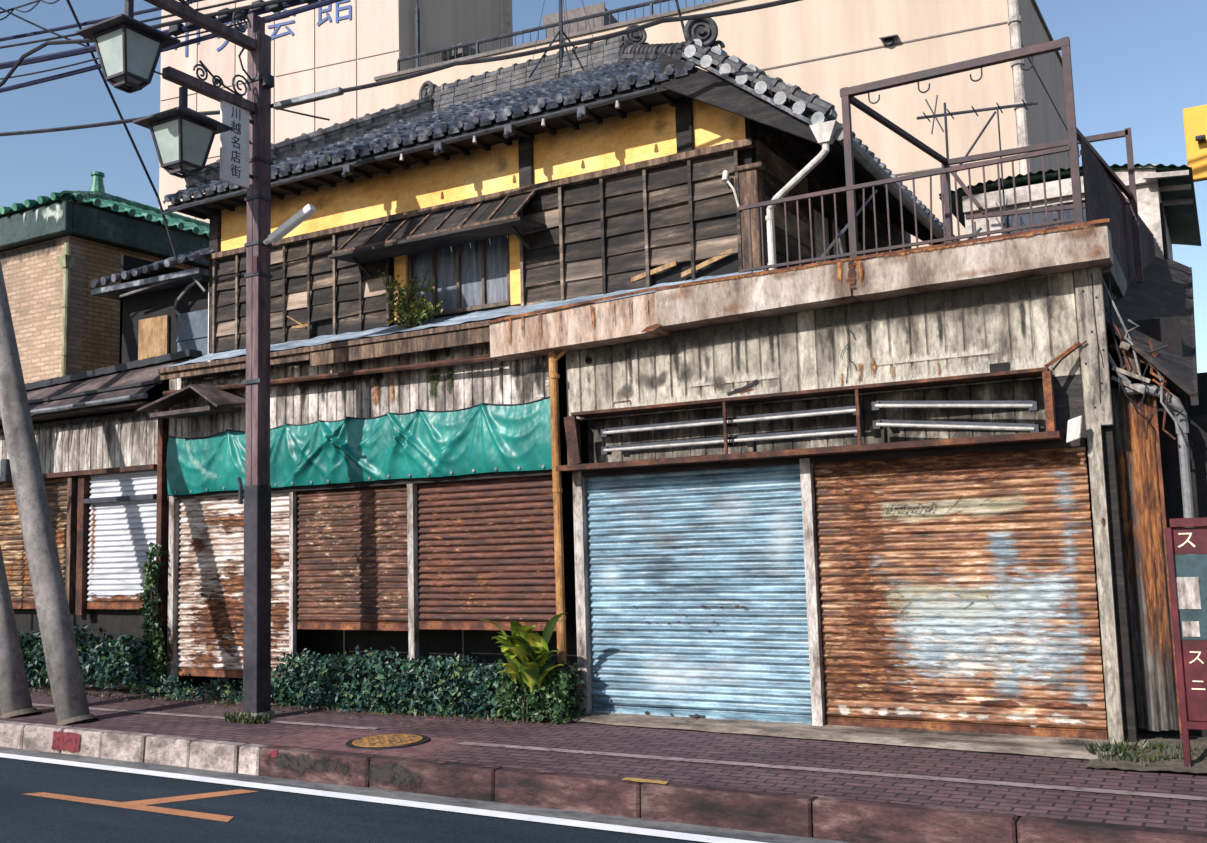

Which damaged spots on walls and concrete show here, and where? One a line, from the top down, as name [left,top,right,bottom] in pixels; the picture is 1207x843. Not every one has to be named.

rust [674,265,819,297]
rust [837,261,863,291]
rust [883,225,1100,259]
rust [177,559,244,673]
rust [189,509,244,552]
rust [271,548,298,665]
rust [427,491,554,612]
rust [807,448,1087,709]
peeling [889,531,1090,703]
peeling [1053,472,1073,507]
rust [1119,398,1171,662]
peeling [838,705,1085,726]